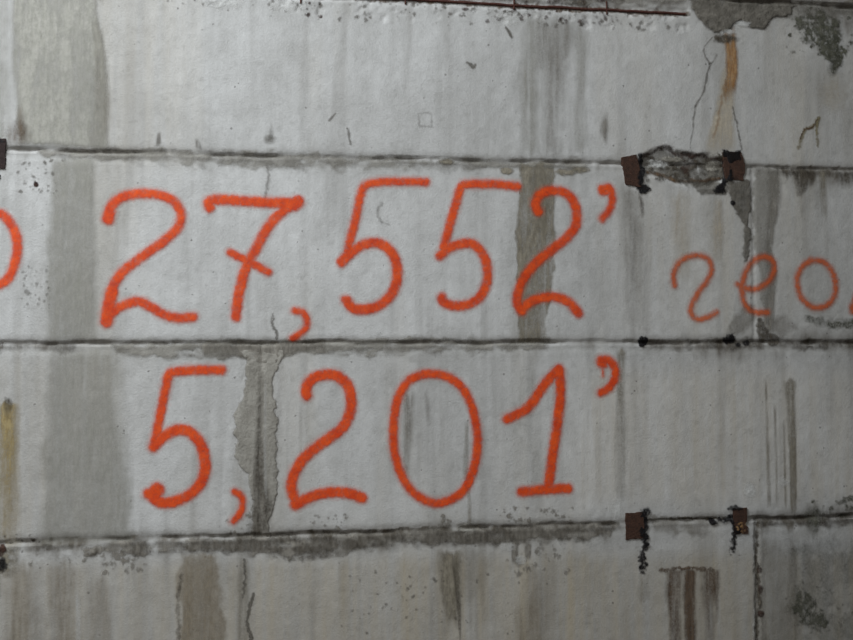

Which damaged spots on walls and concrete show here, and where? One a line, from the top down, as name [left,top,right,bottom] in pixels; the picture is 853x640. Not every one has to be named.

corrosion [710,35,737,144]
spalling [642,146,723,187]